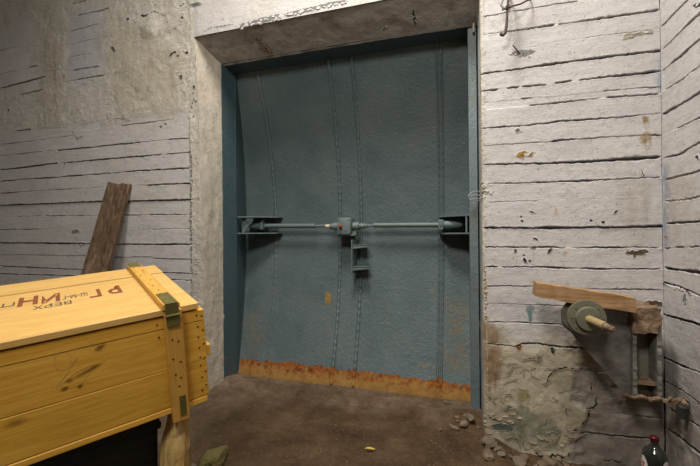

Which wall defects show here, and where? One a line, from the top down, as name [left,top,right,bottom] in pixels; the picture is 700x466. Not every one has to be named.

spalling [515,149,535,159]
spalling [624,246,651,259]
corrosion [238,358,471,402]
peeling [483,407,522,438]
crack [486,356,599,461]